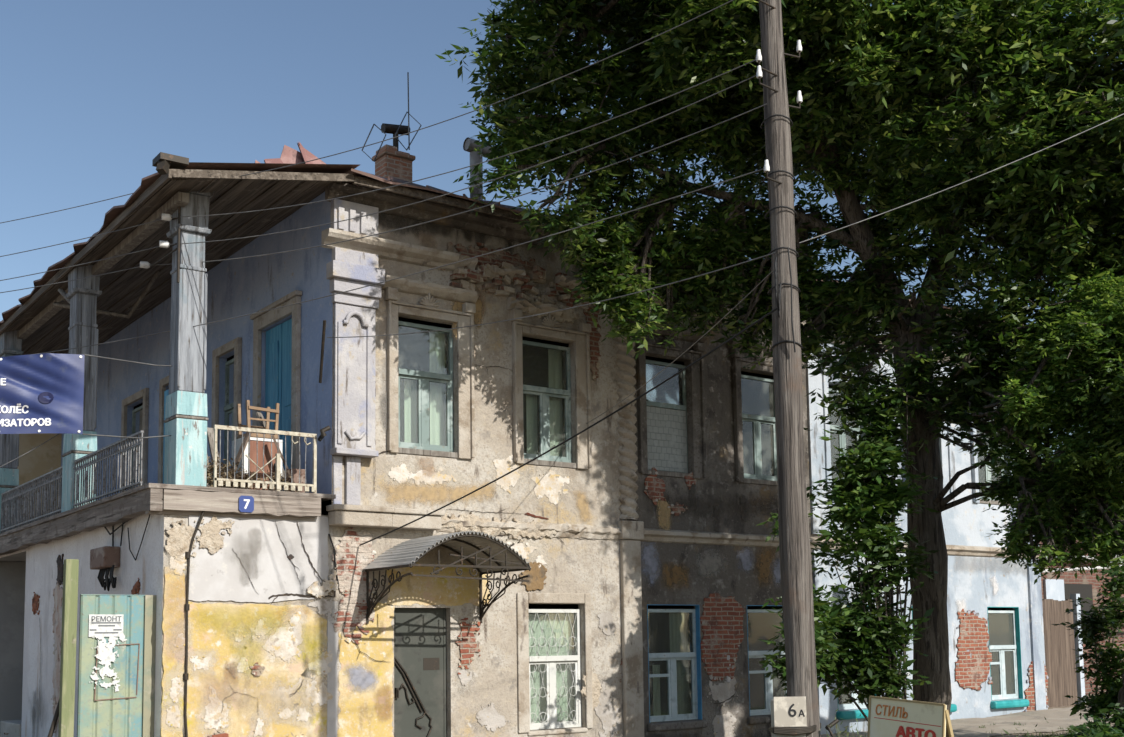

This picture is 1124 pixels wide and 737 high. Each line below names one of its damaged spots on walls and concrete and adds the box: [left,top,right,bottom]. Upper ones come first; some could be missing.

flaking render [446,242,535,283]
peeling [388,464,457,486]
peeling [493,455,570,505]
flaking render [164,515,235,575]
crack [233,521,386,662]
peeling [174,629,211,671]
flaking render [233,528,377,723]
flaking render [456,618,480,690]
flaking render [700,593,745,737]
flaking render [955,609,993,691]
peeling [166,676,183,728]
peeling [202,686,231,737]